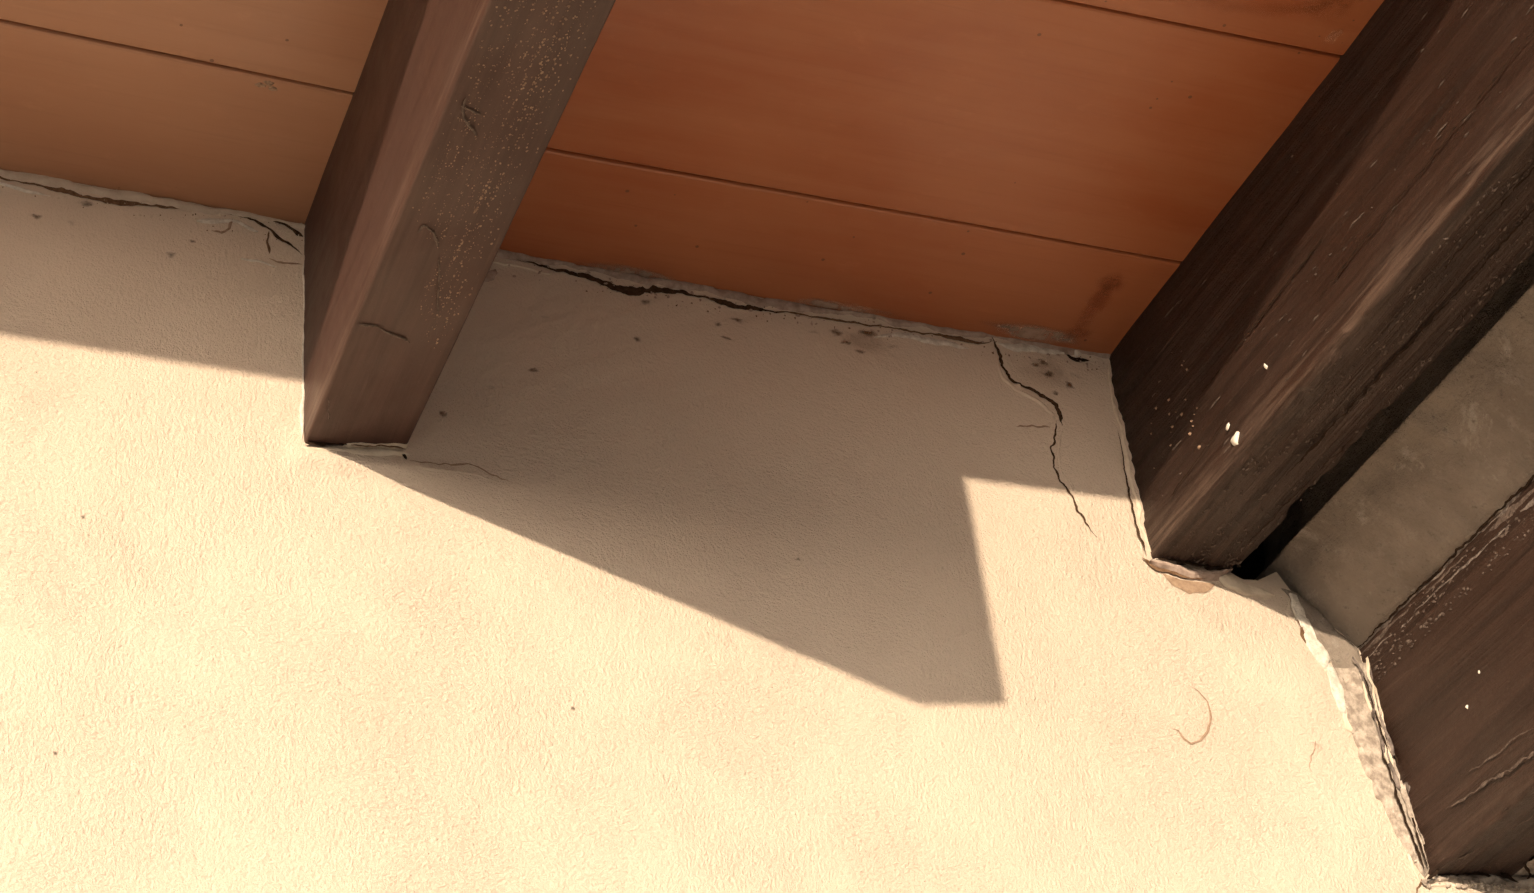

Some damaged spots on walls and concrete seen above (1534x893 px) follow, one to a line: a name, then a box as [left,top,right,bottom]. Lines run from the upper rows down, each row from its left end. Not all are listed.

crack [517,259,1096,536]
peeling [484,159,1534,893]